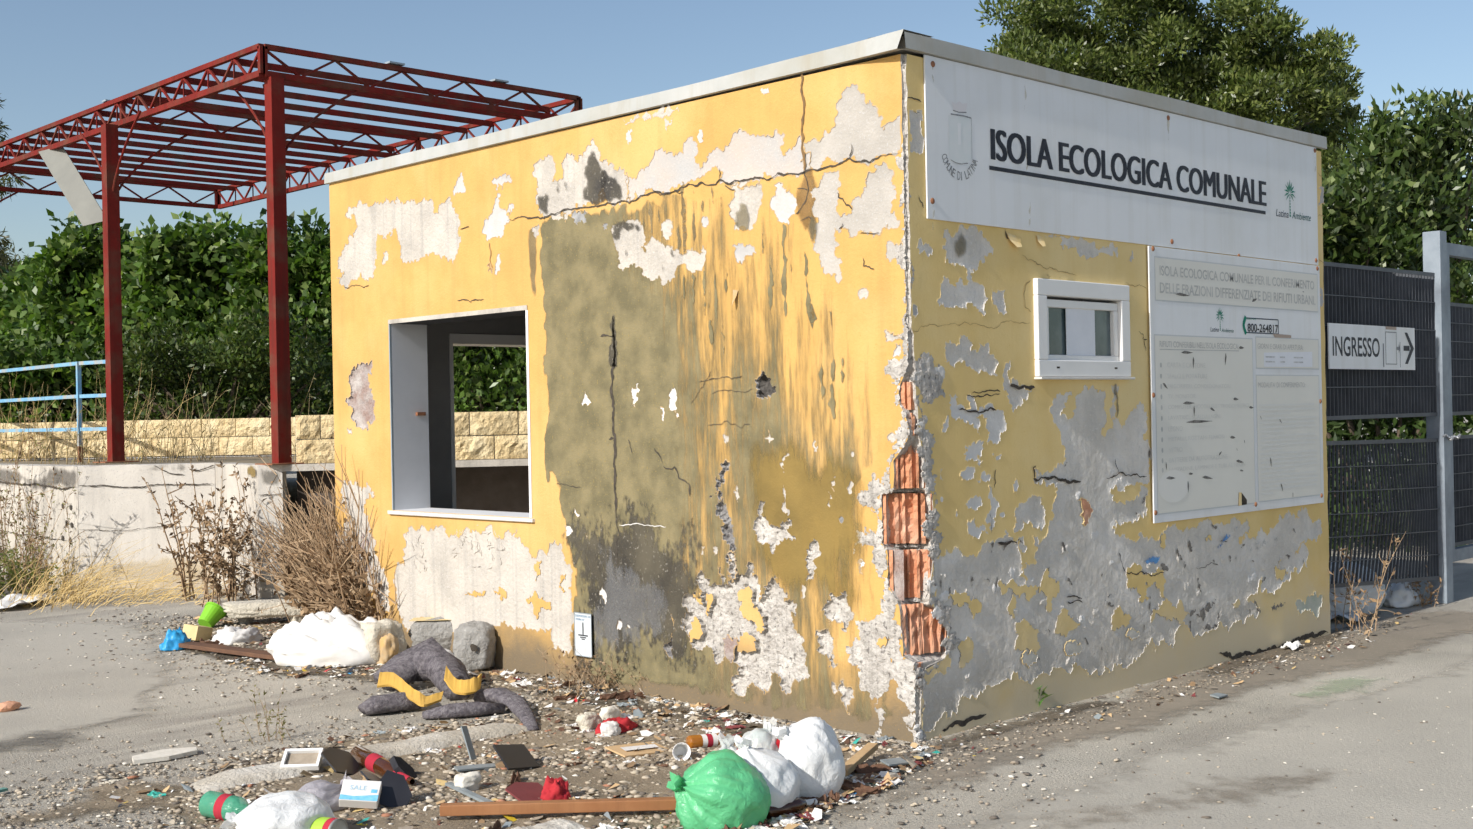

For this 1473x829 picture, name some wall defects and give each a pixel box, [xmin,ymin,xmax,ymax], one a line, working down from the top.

peeling [337,172,466,290]
peeling [482,172,514,276]
crack [457,73,900,302]
water stain [677,184,713,254]
water stain [683,271,728,353]
water stain [735,204,749,230]
water stain [762,217,832,328]
spalling [345,360,376,435]
crack [600,317,690,562]
water stain [818,358,844,419]
peeling [531,59,1323,759]
peeling [335,480,587,657]